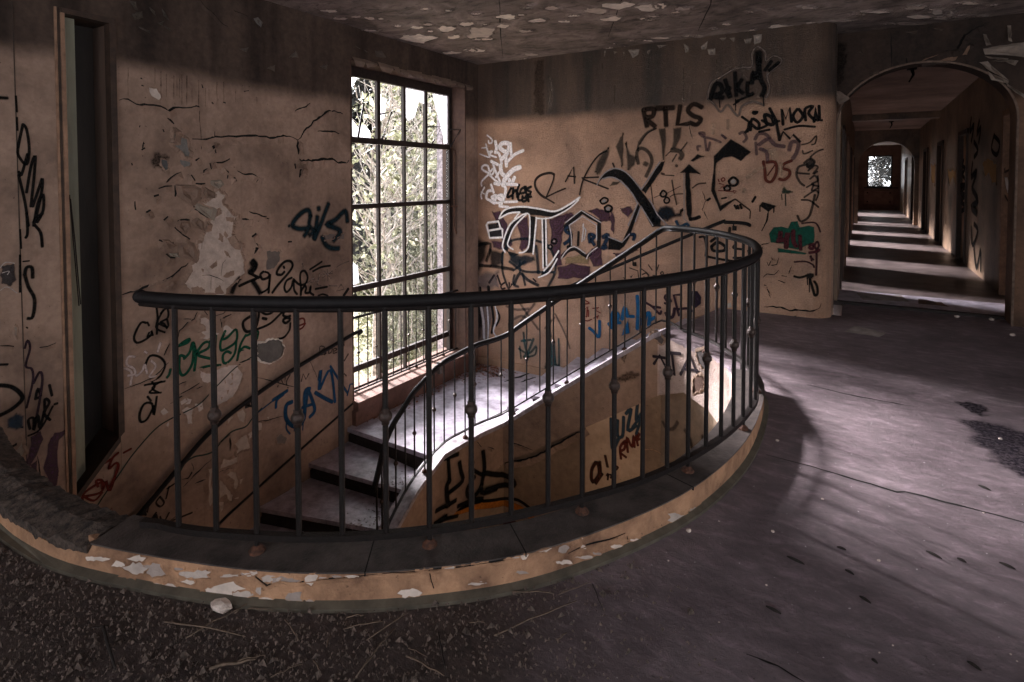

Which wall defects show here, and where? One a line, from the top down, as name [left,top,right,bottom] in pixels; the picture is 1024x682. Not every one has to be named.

peeling [317,0,696,55]
crack [120,78,354,302]
spalling [161,185,247,295]
spalling [257,338,285,364]
spalling [667,502,702,523]
spalling [85,554,360,602]
spalling [395,586,424,598]
spalling [415,561,489,572]
spalling [504,536,641,576]